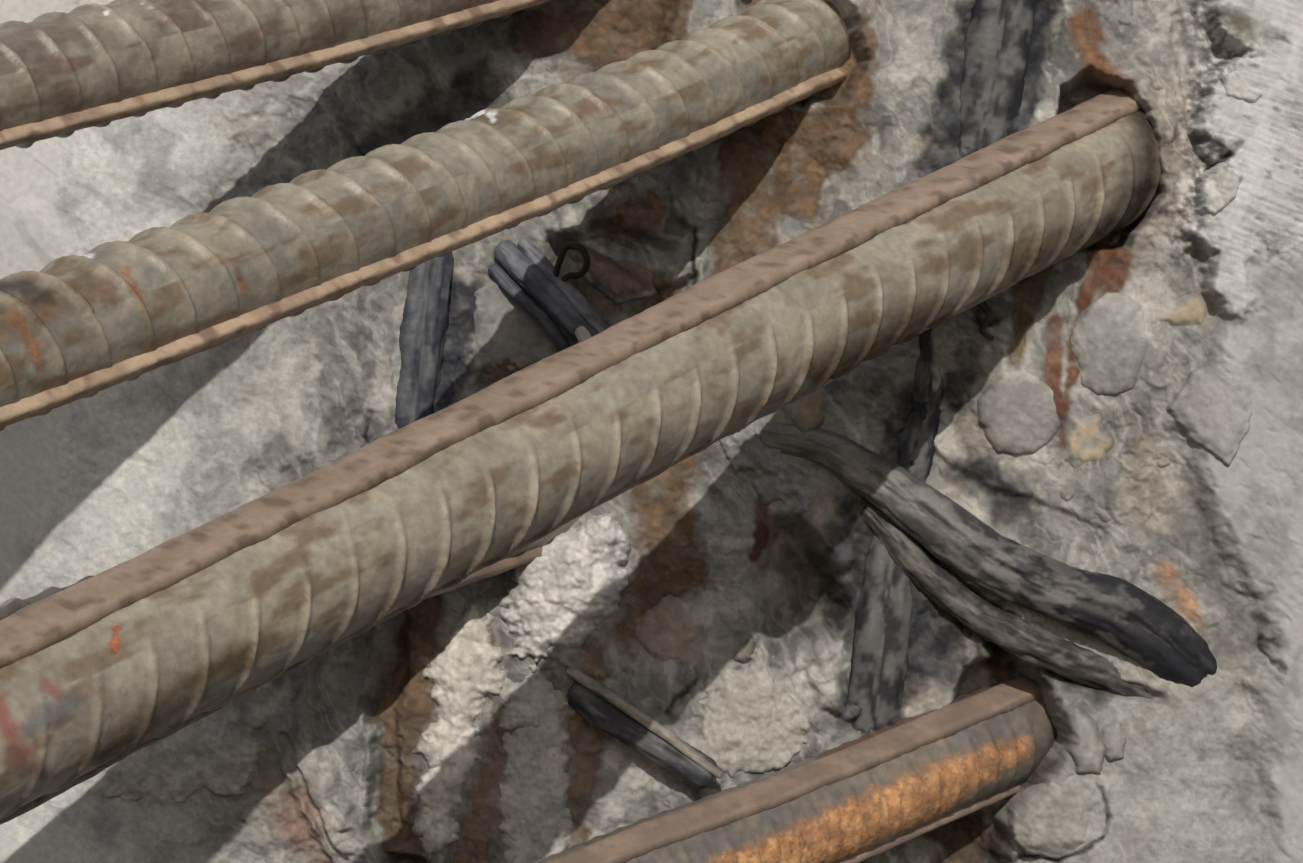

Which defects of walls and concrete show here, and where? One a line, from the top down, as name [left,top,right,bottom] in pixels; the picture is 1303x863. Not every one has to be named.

rust [511,0,691,67]
rust [1069,10,1134,96]
rust [711,13,878,274]
rust [1077,232,1131,314]
rust [1008,265,1079,447]
spalling [536,0,1303,863]
spalling [0,89,1161,863]
rust [569,642,608,690]
rust [976,642,1033,684]
rust [567,711,603,844]
rust [926,813,1009,863]